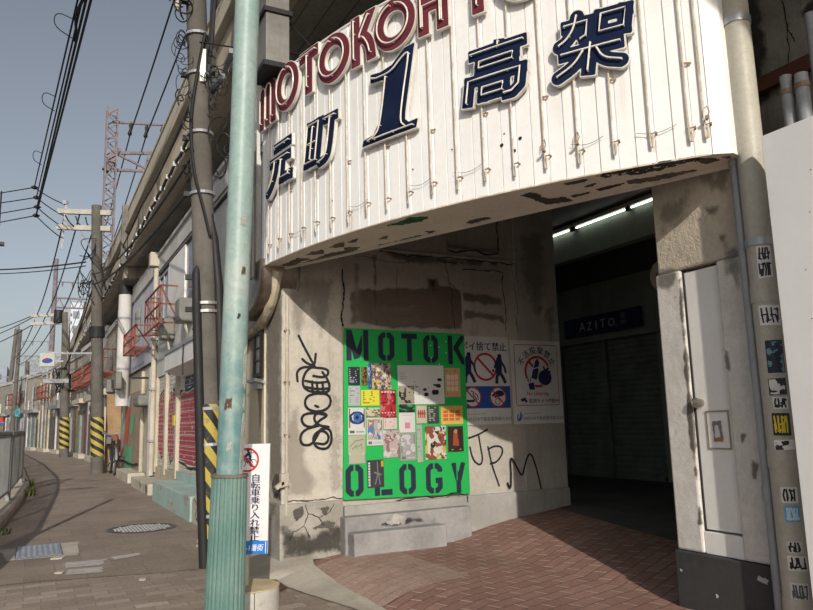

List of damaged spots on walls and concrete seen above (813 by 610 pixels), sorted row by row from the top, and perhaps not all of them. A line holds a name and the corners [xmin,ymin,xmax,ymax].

crack [781,0,796,102]
peeling [387,216,428,226]
peeling [282,239,360,266]
crack [338,269,346,326]
leakage [351,279,504,329]
crack [359,221,518,331]
leakage [659,268,698,476]
crack [288,496,343,540]